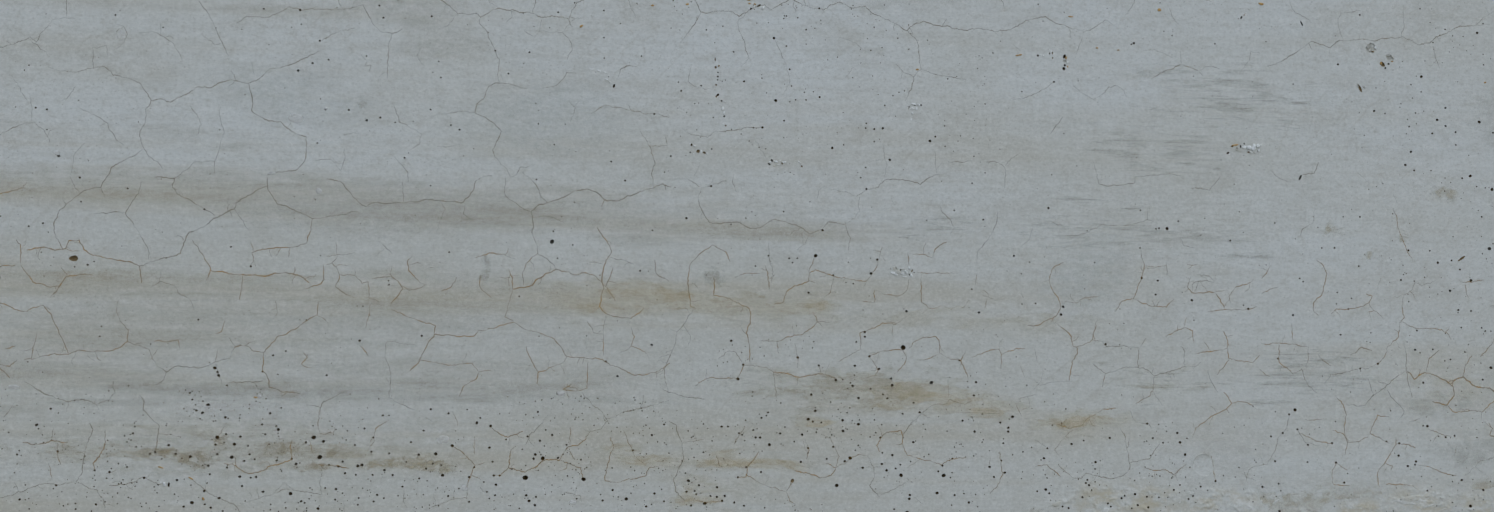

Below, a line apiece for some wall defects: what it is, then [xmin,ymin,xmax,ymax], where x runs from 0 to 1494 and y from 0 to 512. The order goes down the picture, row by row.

crack [0,80,475,510]